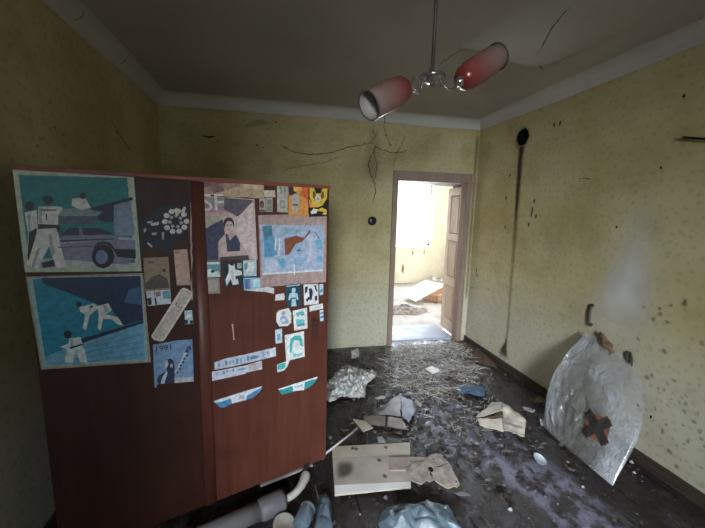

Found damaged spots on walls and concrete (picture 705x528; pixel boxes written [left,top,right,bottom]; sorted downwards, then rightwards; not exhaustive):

crack [537,7,570,70]
crack [283,130,408,200]